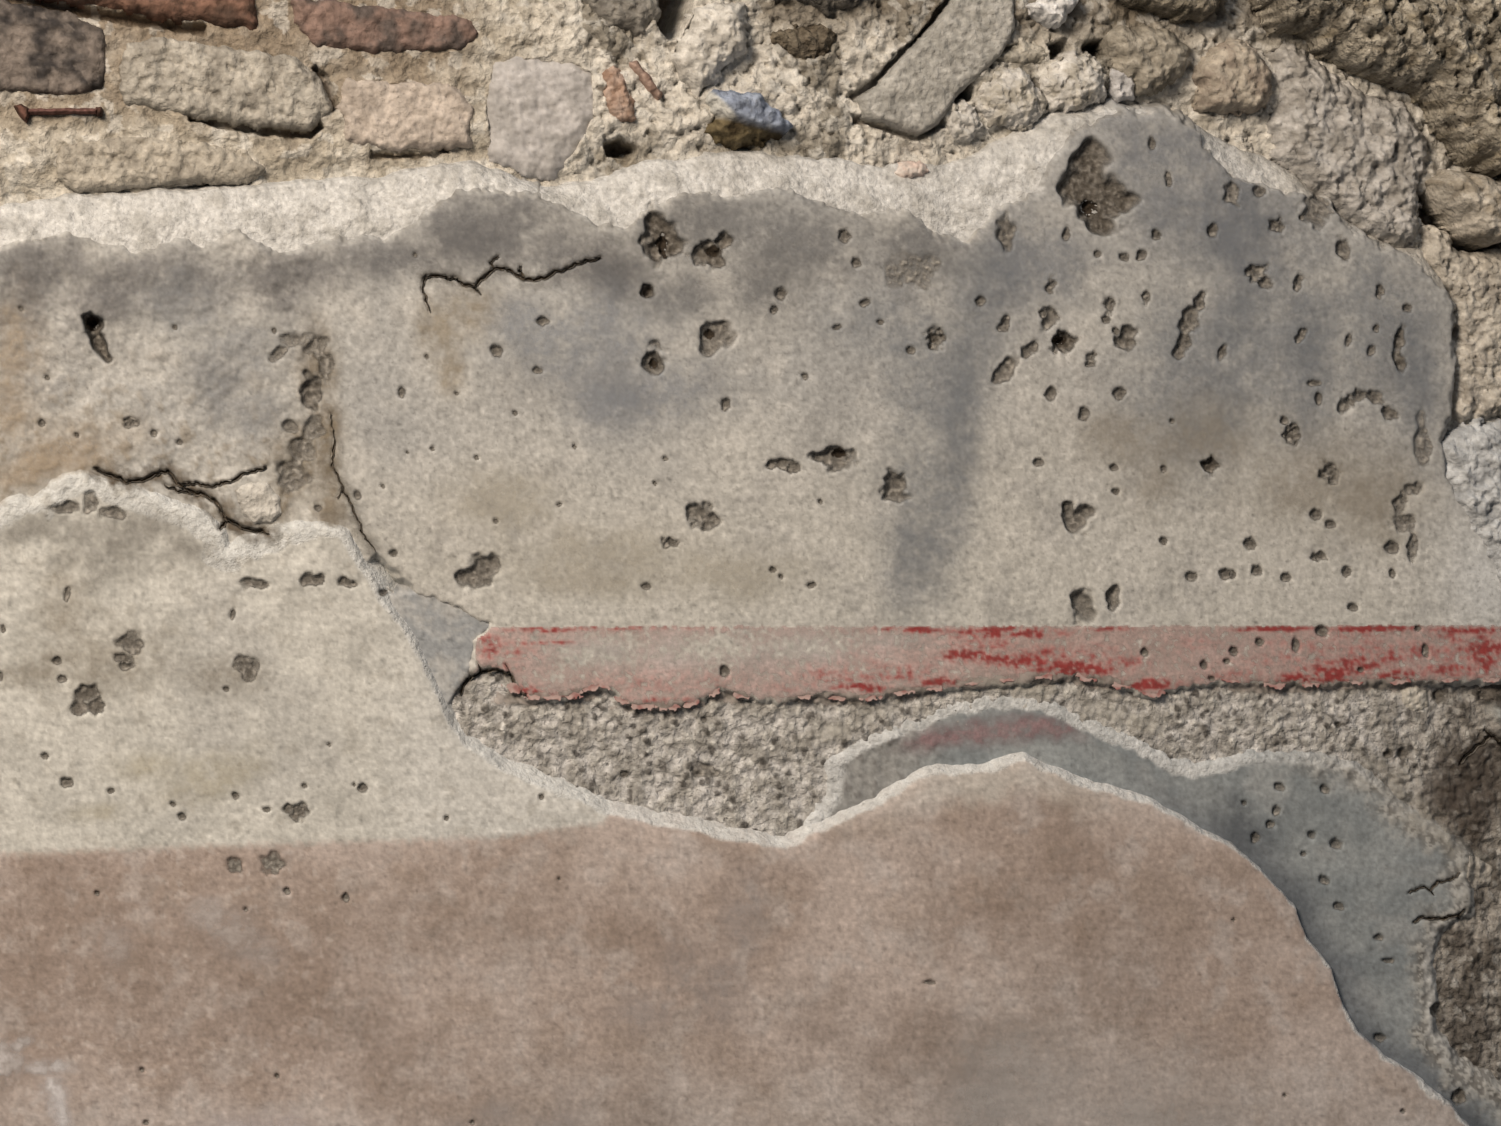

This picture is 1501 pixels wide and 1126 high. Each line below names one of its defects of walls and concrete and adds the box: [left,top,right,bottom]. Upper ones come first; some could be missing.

spalling [1058,139,1139,257]
spalling [640,212,733,268]
spalling [1120,230,1161,261]
crack [422,256,600,312]
crack [95,464,275,538]
crack [327,410,375,550]
peeling [494,665,753,723]
peeling [1200,647,1458,704]
spalling [692,761,719,777]
crack [1460,730,1501,764]
crack [1409,872,1464,923]
spalling [1431,1003,1442,1017]